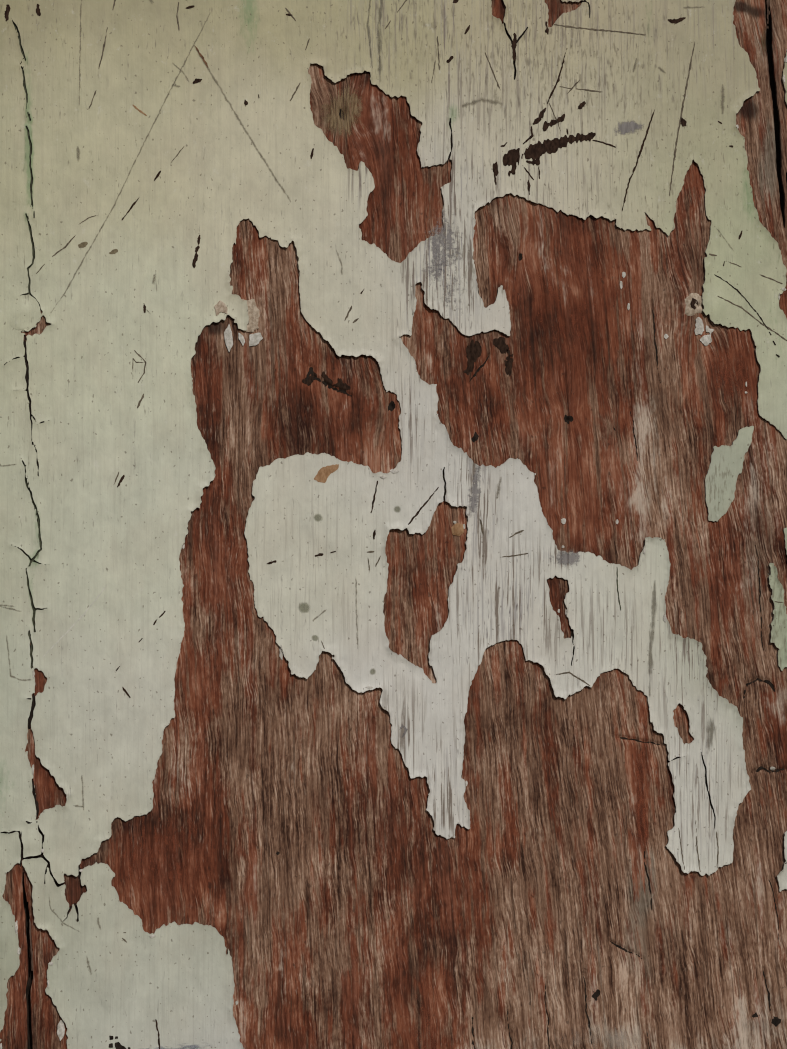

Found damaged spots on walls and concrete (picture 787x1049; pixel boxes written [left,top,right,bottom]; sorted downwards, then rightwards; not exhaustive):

crack [12,20,40,306]
peeling [308,64,452,263]
peeling [545,0,586,27]
peeling [733,0,787,318]
crack [764,0,787,226]
crack [4,331,49,668]
crack [27,694,36,729]
peeling [25,725,67,823]
peeling [58,160,787,1049]
peeling [0,863,68,1049]
crack [1,779,81,1049]
crack [763,971,771,1011]